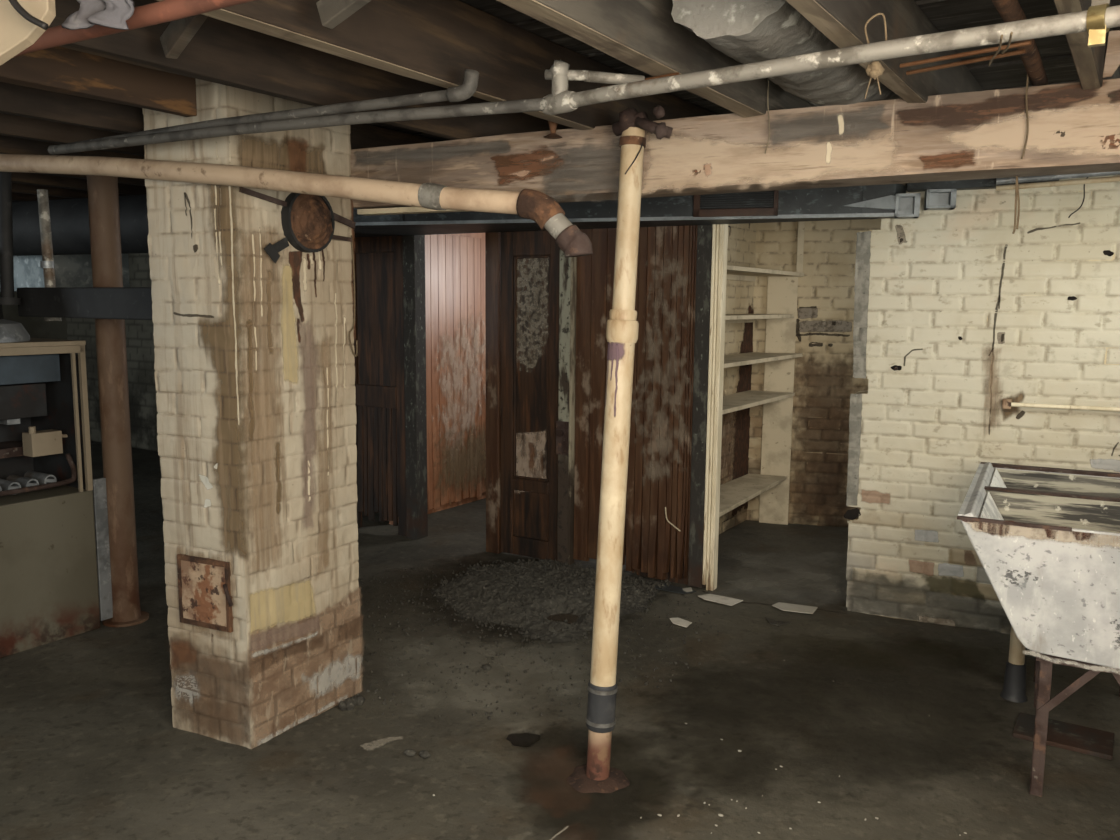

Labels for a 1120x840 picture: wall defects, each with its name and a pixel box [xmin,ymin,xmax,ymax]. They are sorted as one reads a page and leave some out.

damp [216,137,326,174]
peeling [355,139,620,201]
peeling [641,82,1120,193]
damp [199,184,356,568]
damp [795,358,854,527]
flaking render [249,589,363,746]